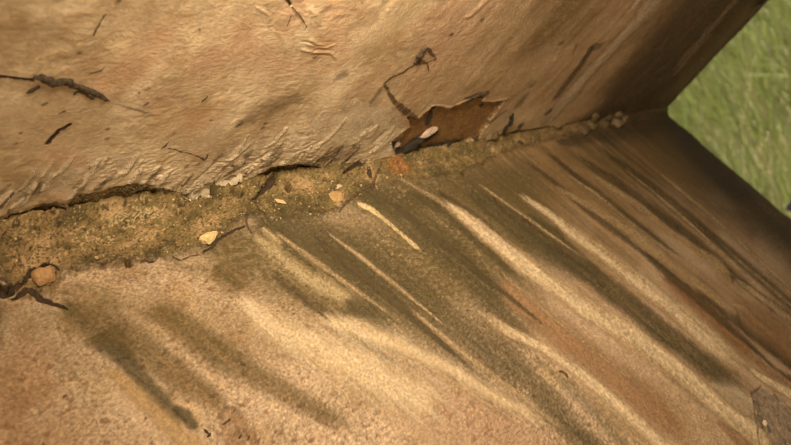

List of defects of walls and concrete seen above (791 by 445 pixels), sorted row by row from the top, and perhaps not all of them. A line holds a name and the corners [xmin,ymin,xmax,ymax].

crack [0,74,111,102]
crack [286,0,307,28]
crack [383,47,437,120]
spalling [0,95,646,295]
crack [0,263,68,310]
water stain [63,302,219,445]
water stain [156,308,337,421]
water stain [214,203,597,445]
water stain [357,180,771,445]
water stain [528,150,791,399]